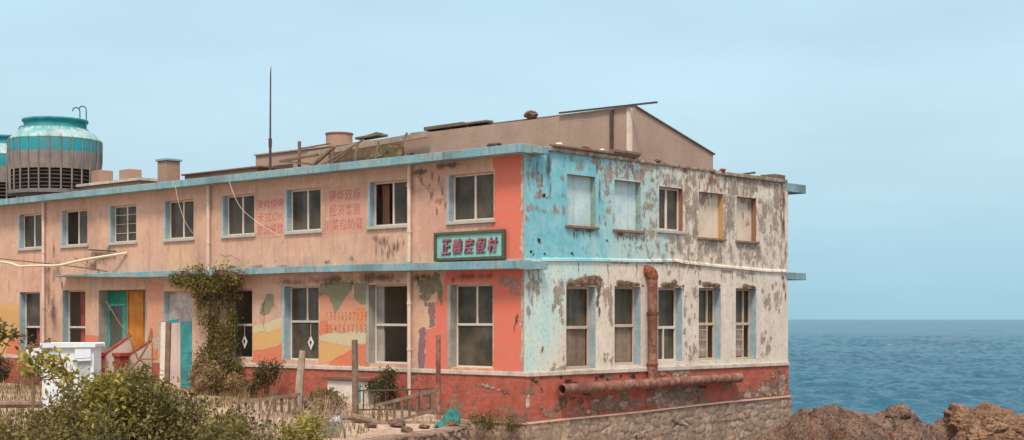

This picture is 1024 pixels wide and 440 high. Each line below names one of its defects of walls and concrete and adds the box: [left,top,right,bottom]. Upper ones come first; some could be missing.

peeling [413,272,443,306]
spalling [499,154,788,417]